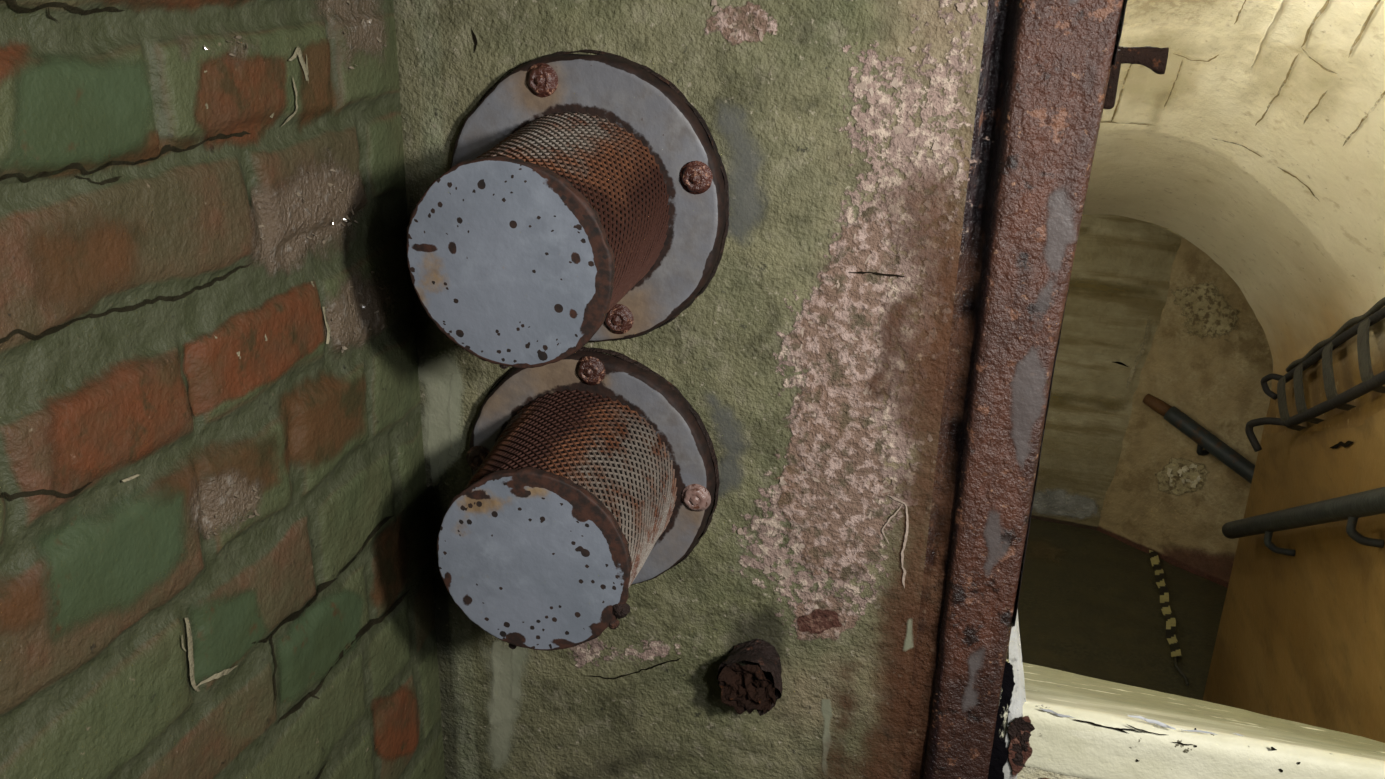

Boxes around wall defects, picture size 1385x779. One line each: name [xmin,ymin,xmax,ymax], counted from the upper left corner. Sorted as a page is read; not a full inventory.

crack [0,0,125,23]
crack [0,131,251,185]
peeling [731,0,989,641]
peeling [1155,458,1209,495]
crack [252,514,410,724]
corrosion [1008,716,1035,779]
peeling [1128,715,1243,748]